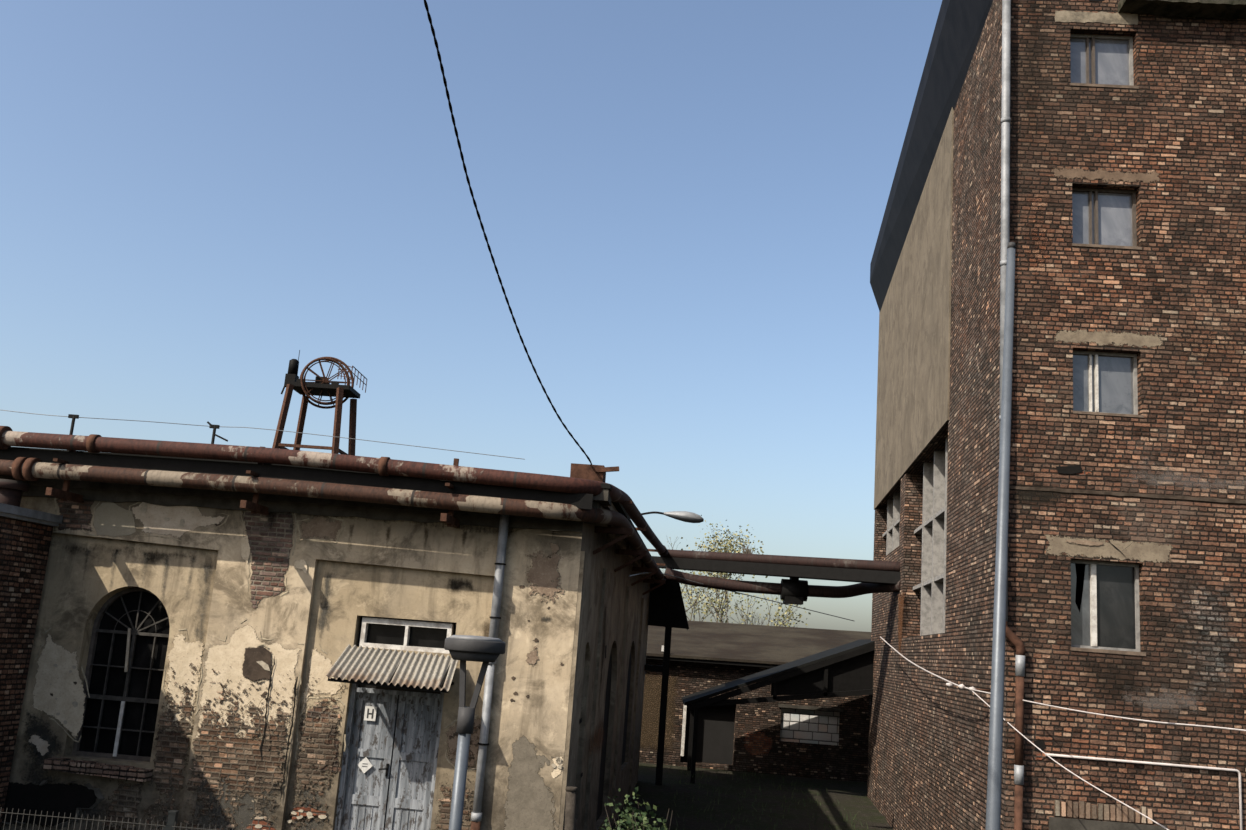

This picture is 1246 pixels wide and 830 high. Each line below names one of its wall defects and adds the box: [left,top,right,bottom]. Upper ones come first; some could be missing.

peeling [1,498,346,830]
flaking render [432,715,481,830]